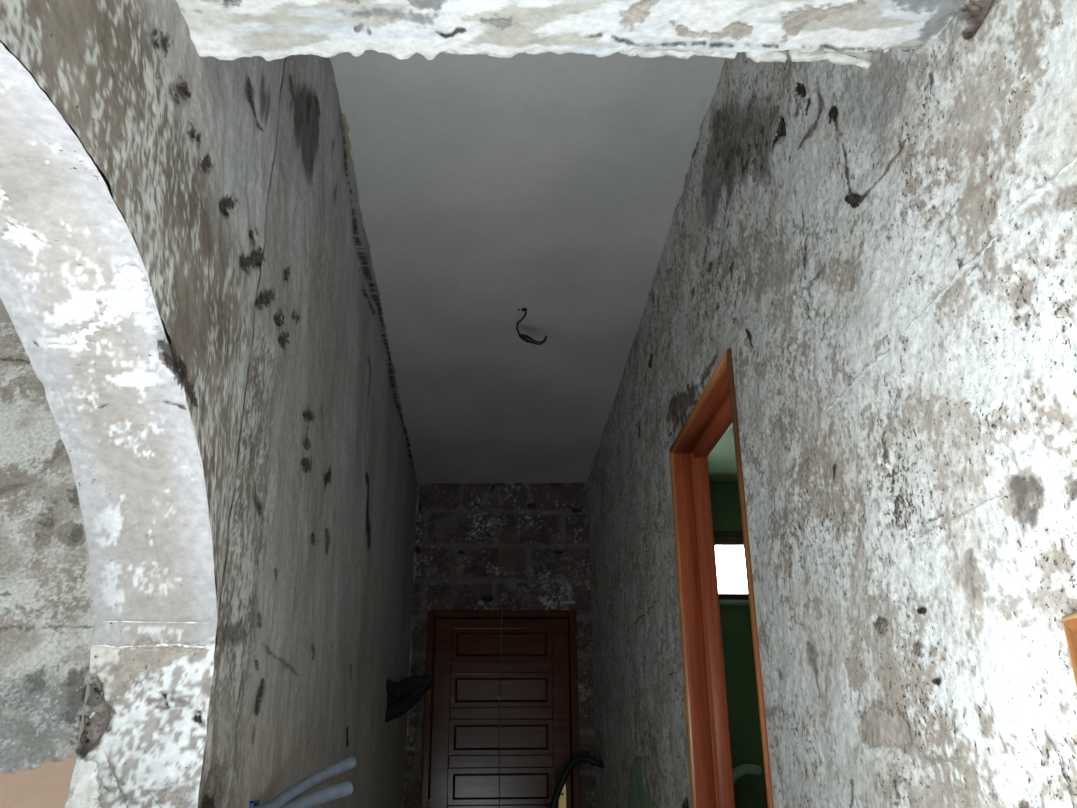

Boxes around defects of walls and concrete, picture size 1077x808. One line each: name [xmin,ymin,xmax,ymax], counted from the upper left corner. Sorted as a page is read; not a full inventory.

spalling [223,620,248,646]
spalling [0,639,211,808]
spalling [199,757,226,808]